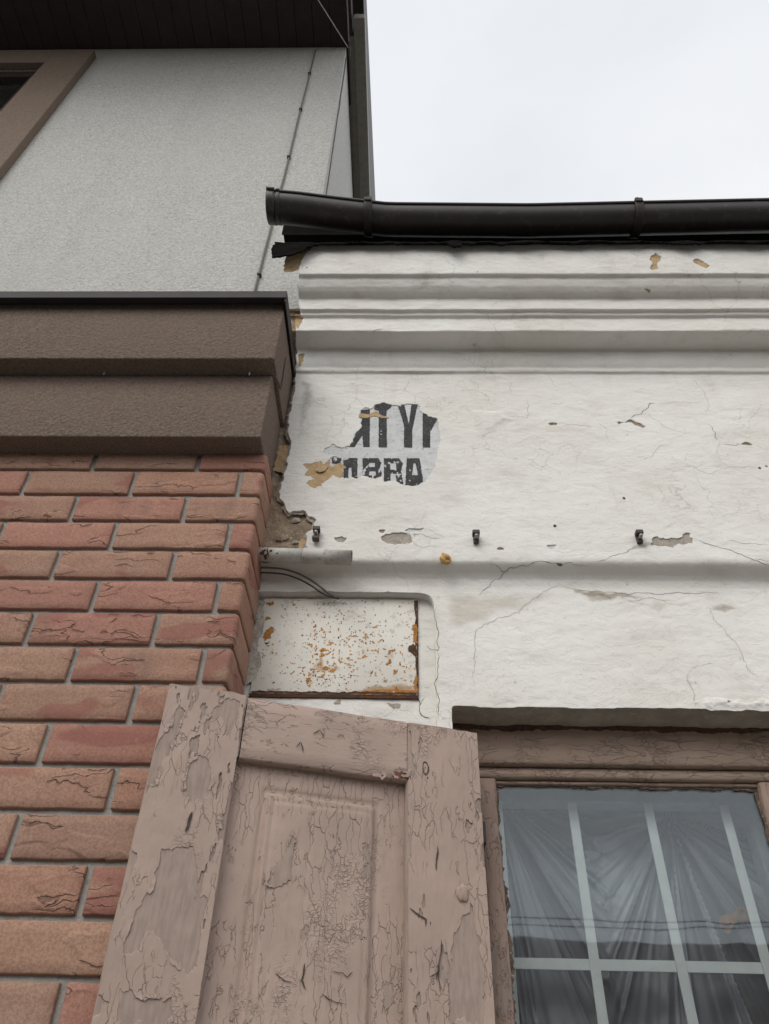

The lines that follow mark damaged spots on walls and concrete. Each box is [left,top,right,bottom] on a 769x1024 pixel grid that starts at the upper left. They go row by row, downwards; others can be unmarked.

spalling [283,248,311,272]
peeling [650,254,661,270]
spalling [264,309,316,548]
peeling [303,403,441,488]
peeling [379,529,436,545]
peeling [650,533,769,566]
crack [468,547,712,690]
corrosion [251,599,419,696]
peeling [145,697,188,795]
peeling [372,771,410,780]
peeling [113,989,172,1024]